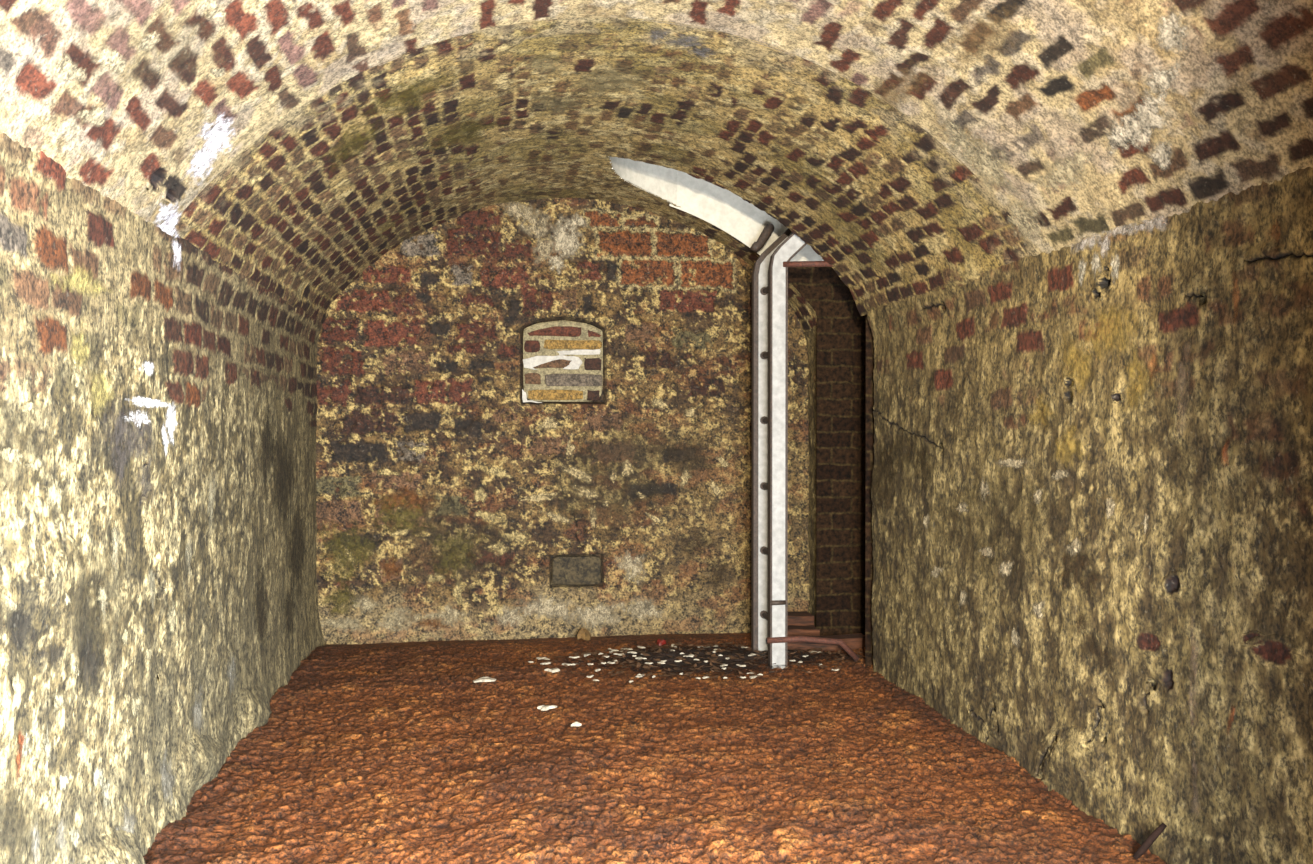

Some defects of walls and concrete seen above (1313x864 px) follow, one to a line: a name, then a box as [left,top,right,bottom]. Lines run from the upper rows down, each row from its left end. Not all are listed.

damp [188,115,234,176]
damp [156,204,181,265]
crack [1244,235,1313,277]
damp [72,333,177,496]